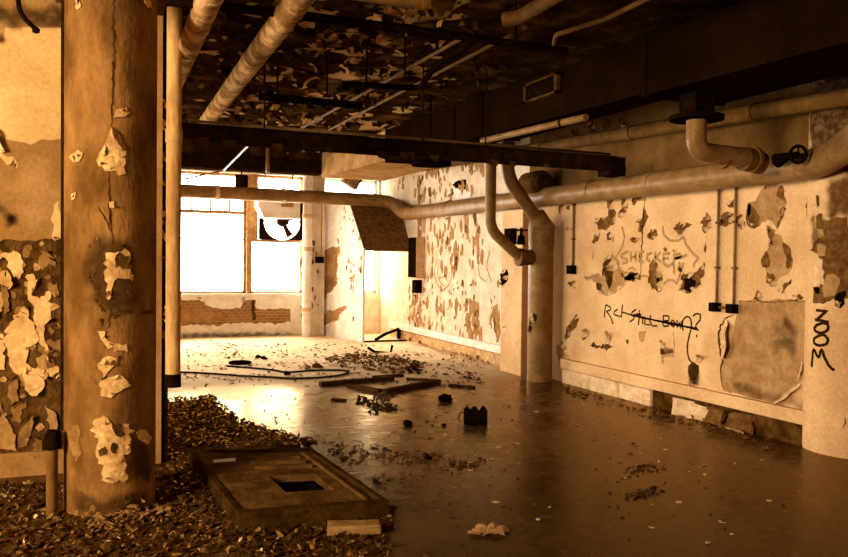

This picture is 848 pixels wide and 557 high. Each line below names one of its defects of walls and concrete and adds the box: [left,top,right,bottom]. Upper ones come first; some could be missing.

peeling [0,27,61,168]
peeling [0,200,152,483]
crack [98,171,113,242]
peeling [96,128,126,175]
crack [109,0,117,126]
flaking render [181,297,291,326]
peeling [301,228,362,318]
peeling [214,0,558,134]
peeling [407,213,508,359]
peeling [568,254,663,296]
peeling [592,197,658,244]
peeling [673,183,848,404]